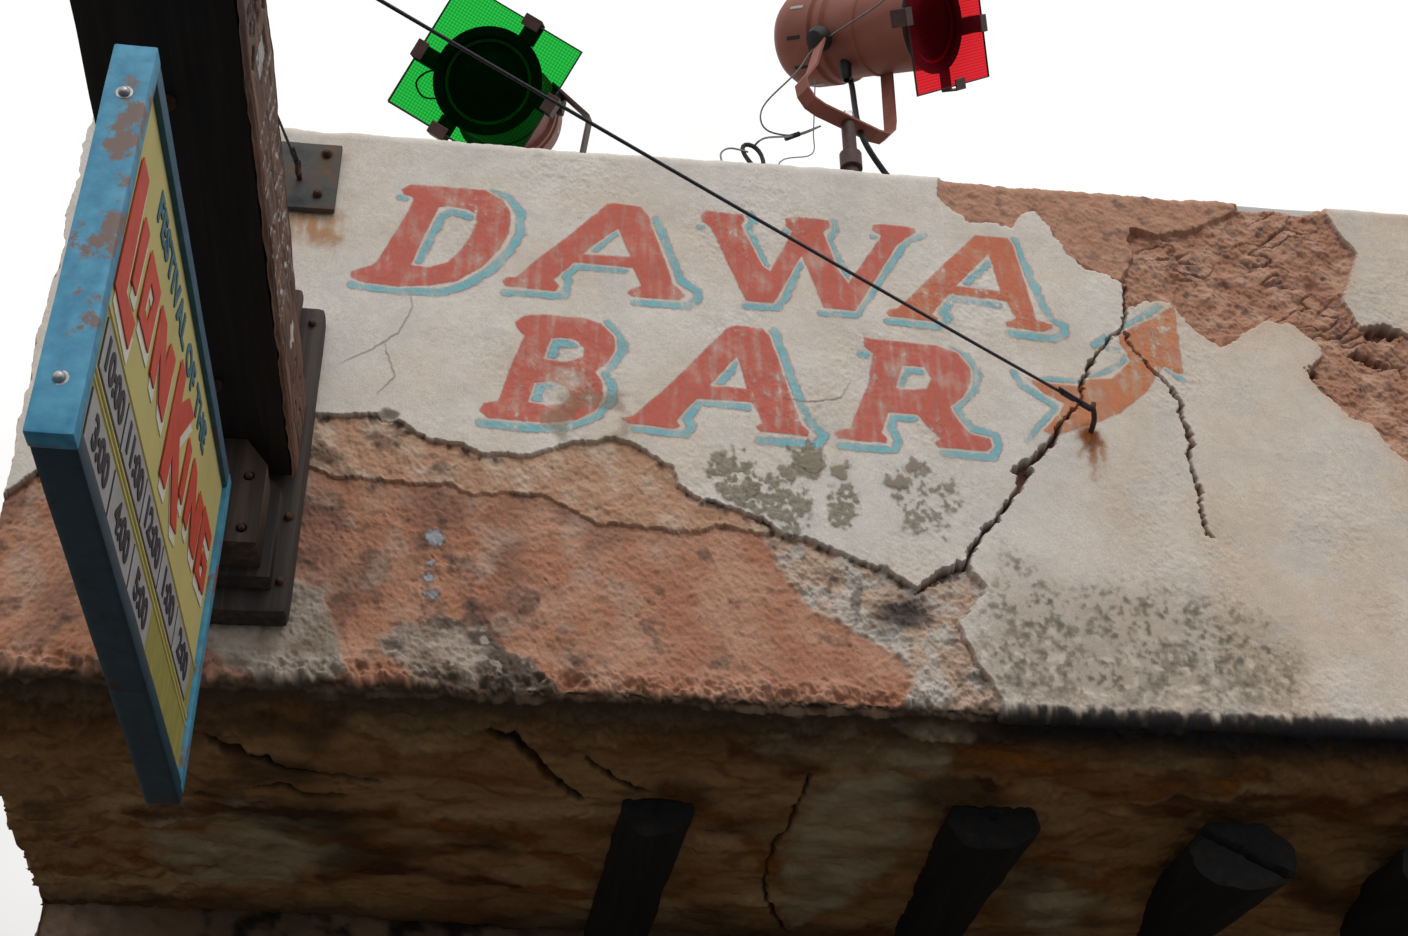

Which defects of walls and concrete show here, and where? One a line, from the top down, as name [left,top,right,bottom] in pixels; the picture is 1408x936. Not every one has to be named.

spalling [937,179,1408,461]
crack [917,308,1211,593]
corrosion [1080,426,1103,457]
spalling [0,471,105,683]
crack [488,728,637,801]
spalling [200,412,1004,723]
crack [761,773,810,935]
leakage [979,583,1408,753]